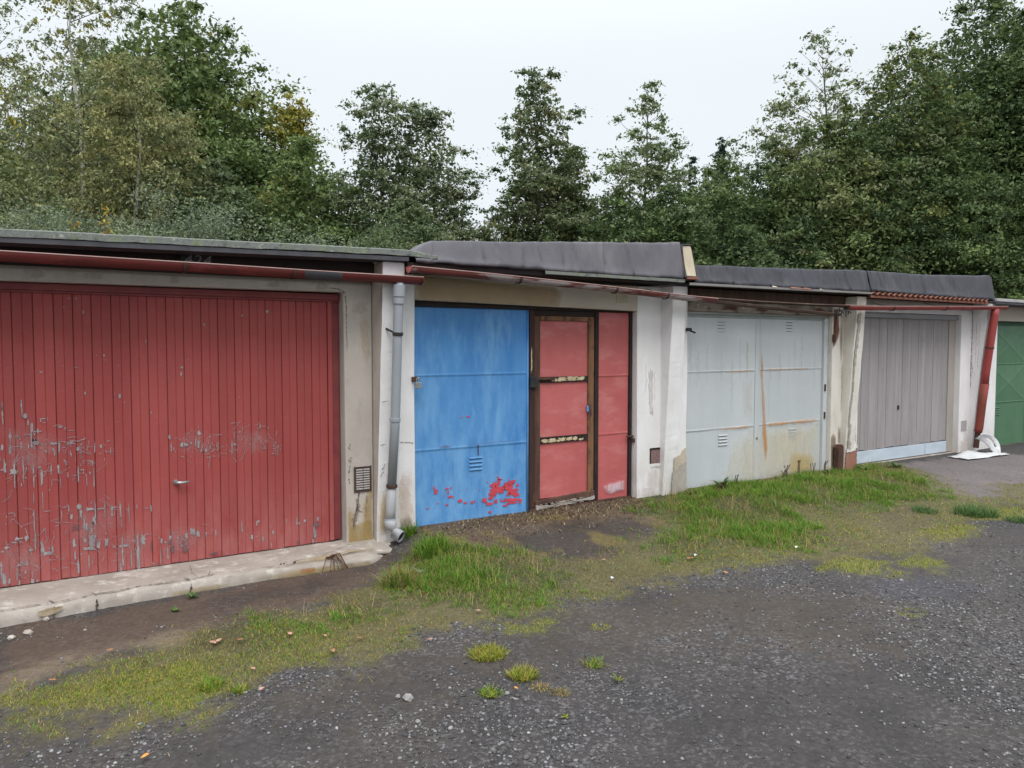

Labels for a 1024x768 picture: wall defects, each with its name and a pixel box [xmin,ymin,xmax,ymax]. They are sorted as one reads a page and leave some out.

peeling [0,399,217,586]
peeling [426,476,522,513]
rust [730,353,814,454]
water stain [728,426,816,480]